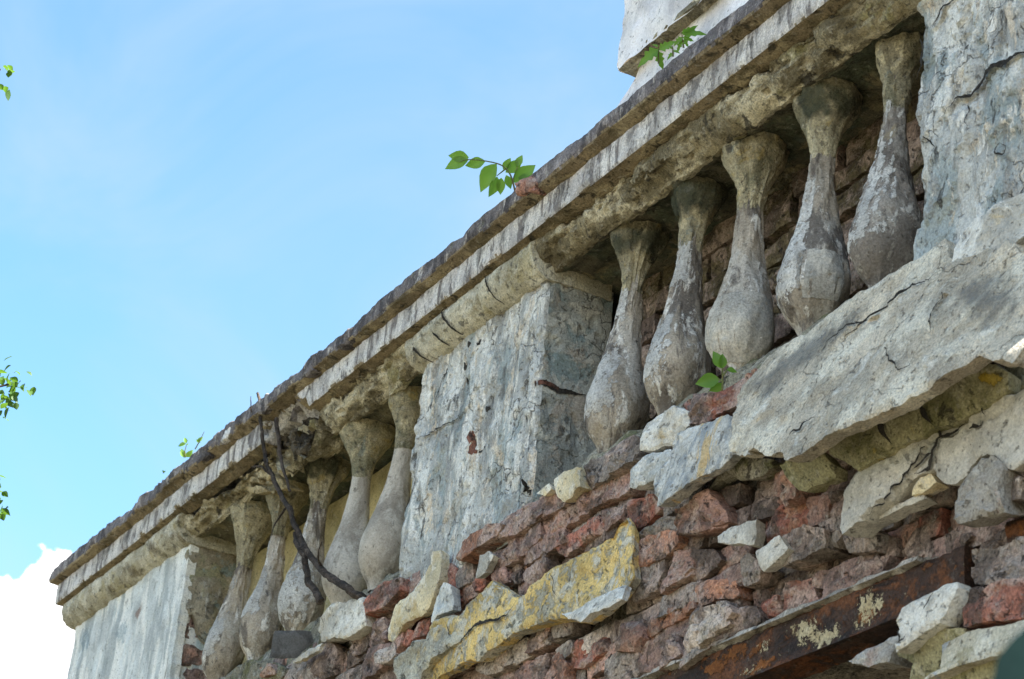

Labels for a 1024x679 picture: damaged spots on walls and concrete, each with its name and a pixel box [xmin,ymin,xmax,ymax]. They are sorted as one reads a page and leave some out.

crack [941,51,1024,126]
crack [823,271,943,349]
spalling [337,327,356,351]
spalling [303,364,322,378]
crack [535,379,585,395]
crack [884,347,915,370]
spalling [200,427,231,462]
spalling [280,417,321,461]
crack [869,406,986,515]
spalling [240,474,303,498]
peeling [277,562,313,623]
rust [700,640,775,676]